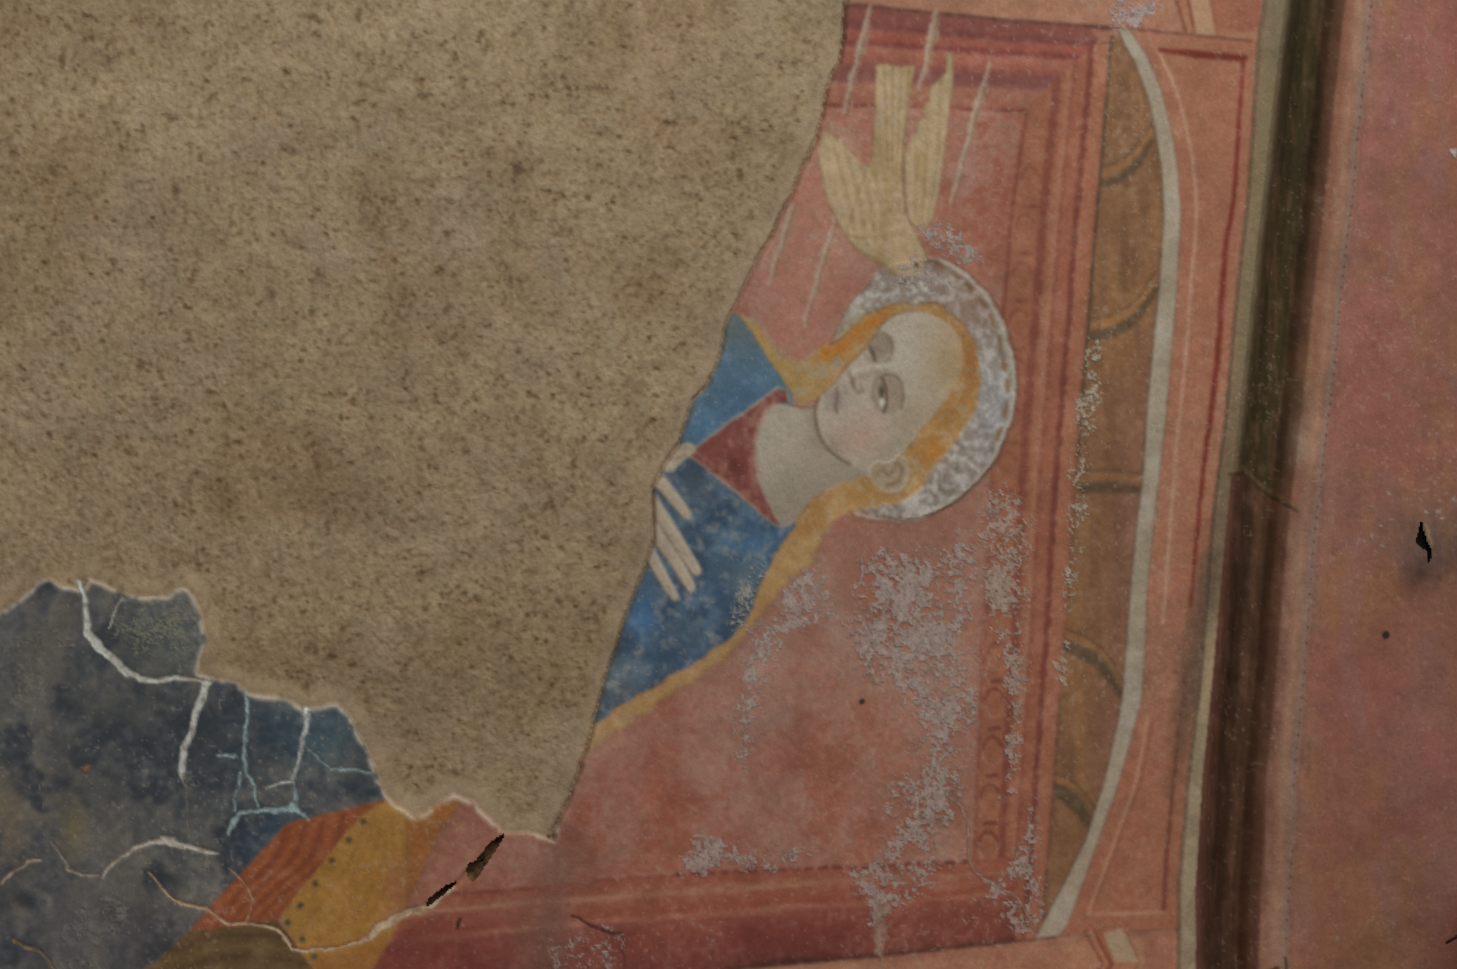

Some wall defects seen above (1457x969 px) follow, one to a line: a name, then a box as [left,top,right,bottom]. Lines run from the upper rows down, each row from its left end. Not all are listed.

flaking render [0,0,847,906]
spalling [1416,498,1455,563]
crack [0,580,454,953]
crack [13,939,54,969]
leakage [874,906,888,962]